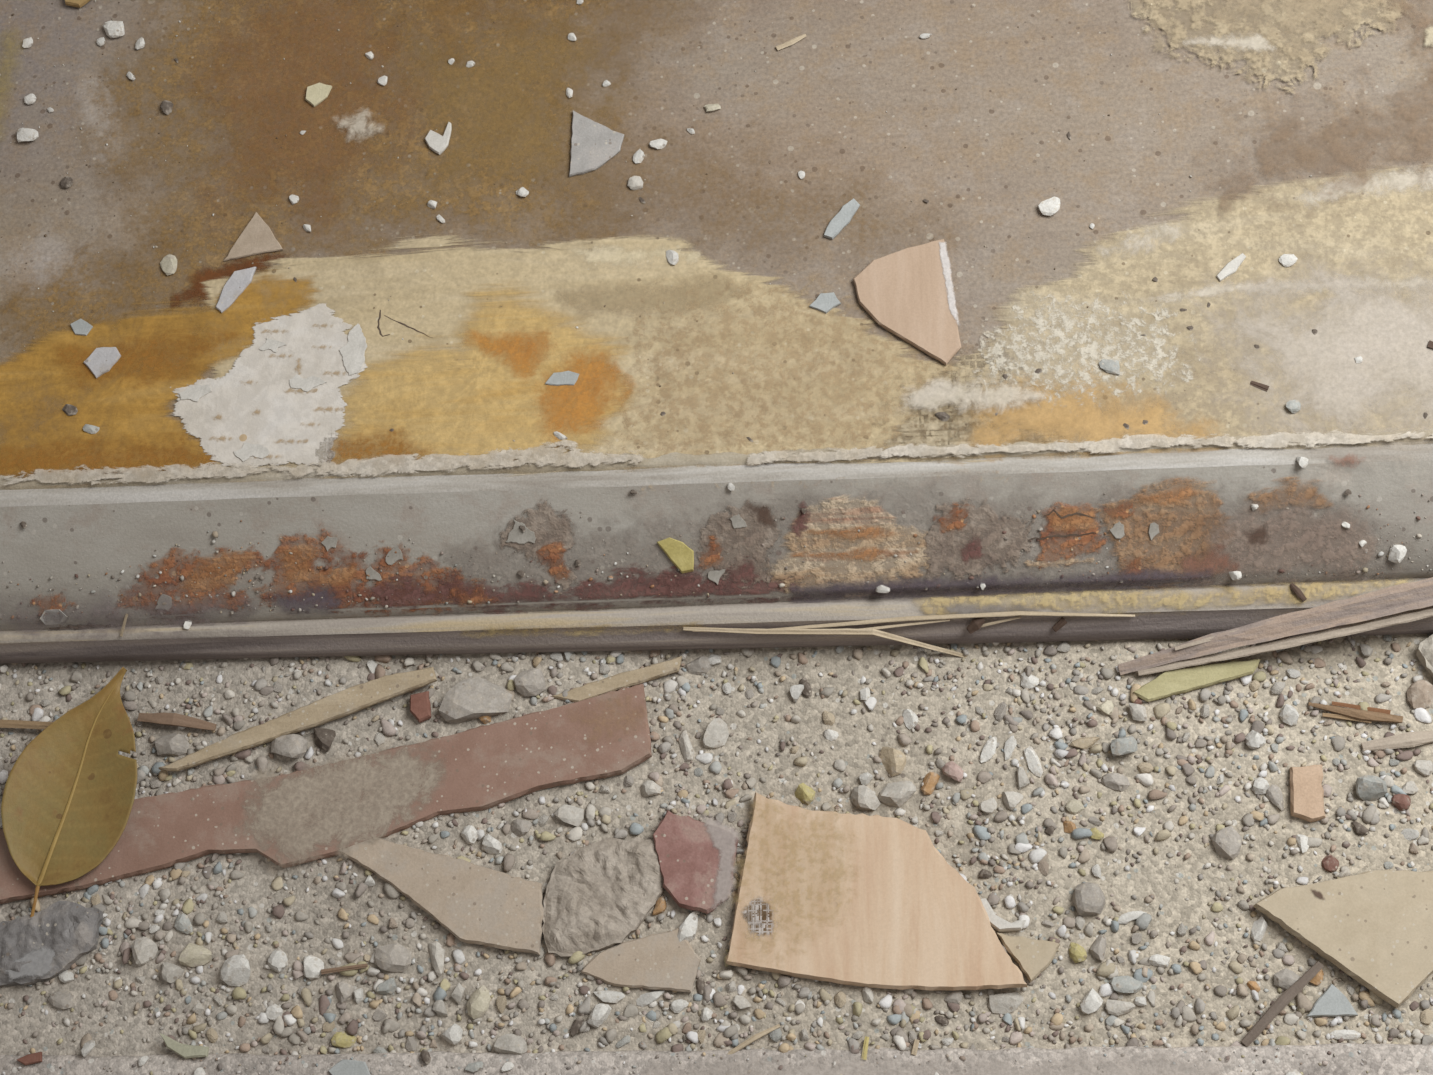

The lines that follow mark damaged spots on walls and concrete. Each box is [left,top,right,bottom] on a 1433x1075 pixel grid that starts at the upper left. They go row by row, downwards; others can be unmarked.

peeling [1128,0,1411,93]
peeling [172,168,1433,468]